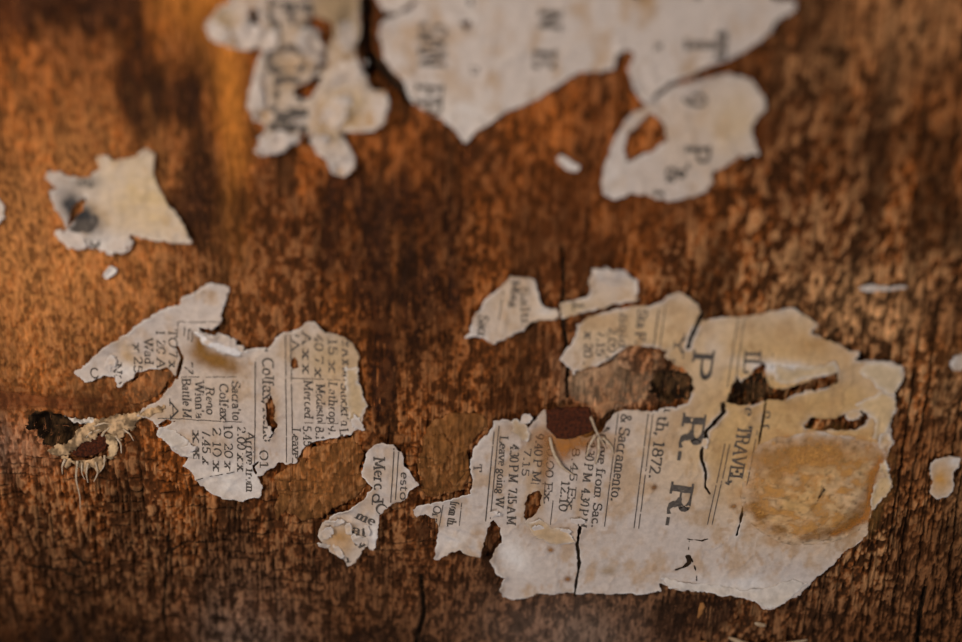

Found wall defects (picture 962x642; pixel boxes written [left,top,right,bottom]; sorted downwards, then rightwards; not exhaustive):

peeling [205,21,279,54]
peeling [254,20,367,156]
peeling [371,94,389,122]
peeling [557,155,580,172]
peeling [54,230,90,250]
peeling [597,267,635,289]
peeling [202,333,245,355]
peeling [845,410,863,421]
damp [751,442,884,540]
peeling [317,519,371,559]
crack [573,526,582,597]
crack [915,586,927,642]